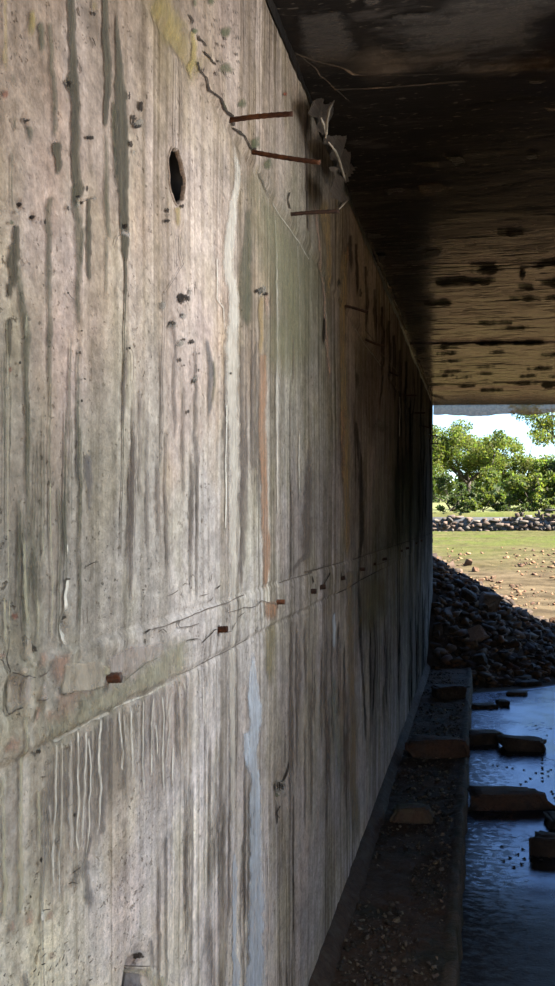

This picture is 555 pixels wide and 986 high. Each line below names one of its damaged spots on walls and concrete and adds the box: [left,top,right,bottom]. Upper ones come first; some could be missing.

damp [38,0,92,317]
crack [174,0,256,150]
crack [259,109,310,259]
peeling [299,12,356,62]
damp [102,0,268,986]
crack [0,481,431,715]
rust [259,295,270,586]
rust [265,602,277,677]
damp [349,236,505,522]
crack [437,339,544,347]
damp [38,676,187,893]
spalling [118,929,155,986]